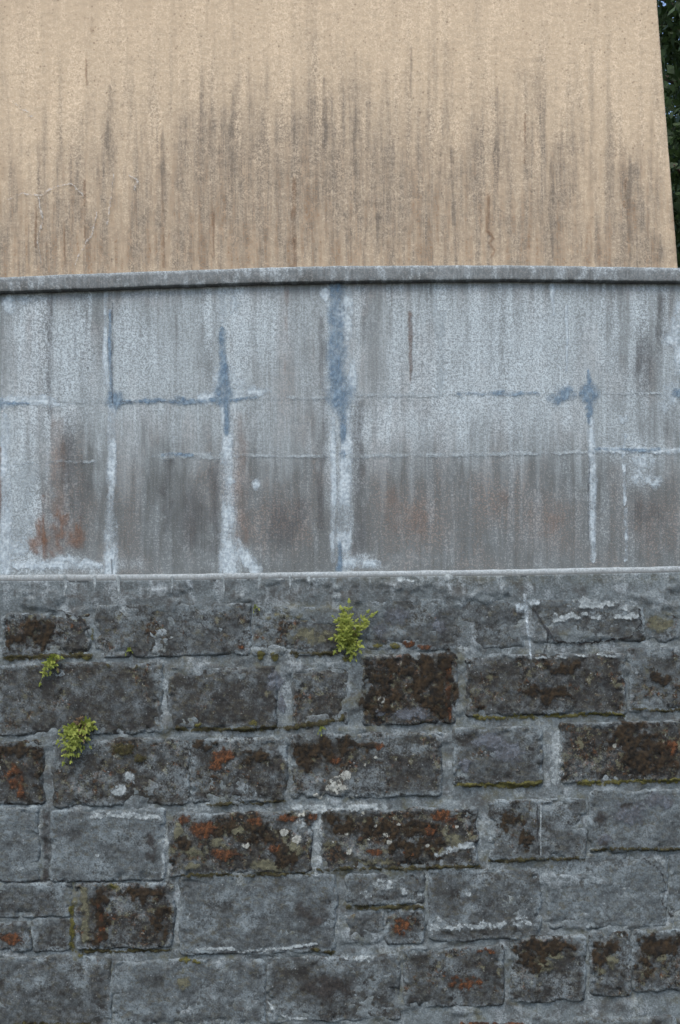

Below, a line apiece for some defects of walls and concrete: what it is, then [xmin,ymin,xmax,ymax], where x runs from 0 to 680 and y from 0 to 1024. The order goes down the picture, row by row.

water stain [2,294,27,314]
water stain [0,395,120,599]
water stain [57,283,406,598]
water stain [554,369,680,562]